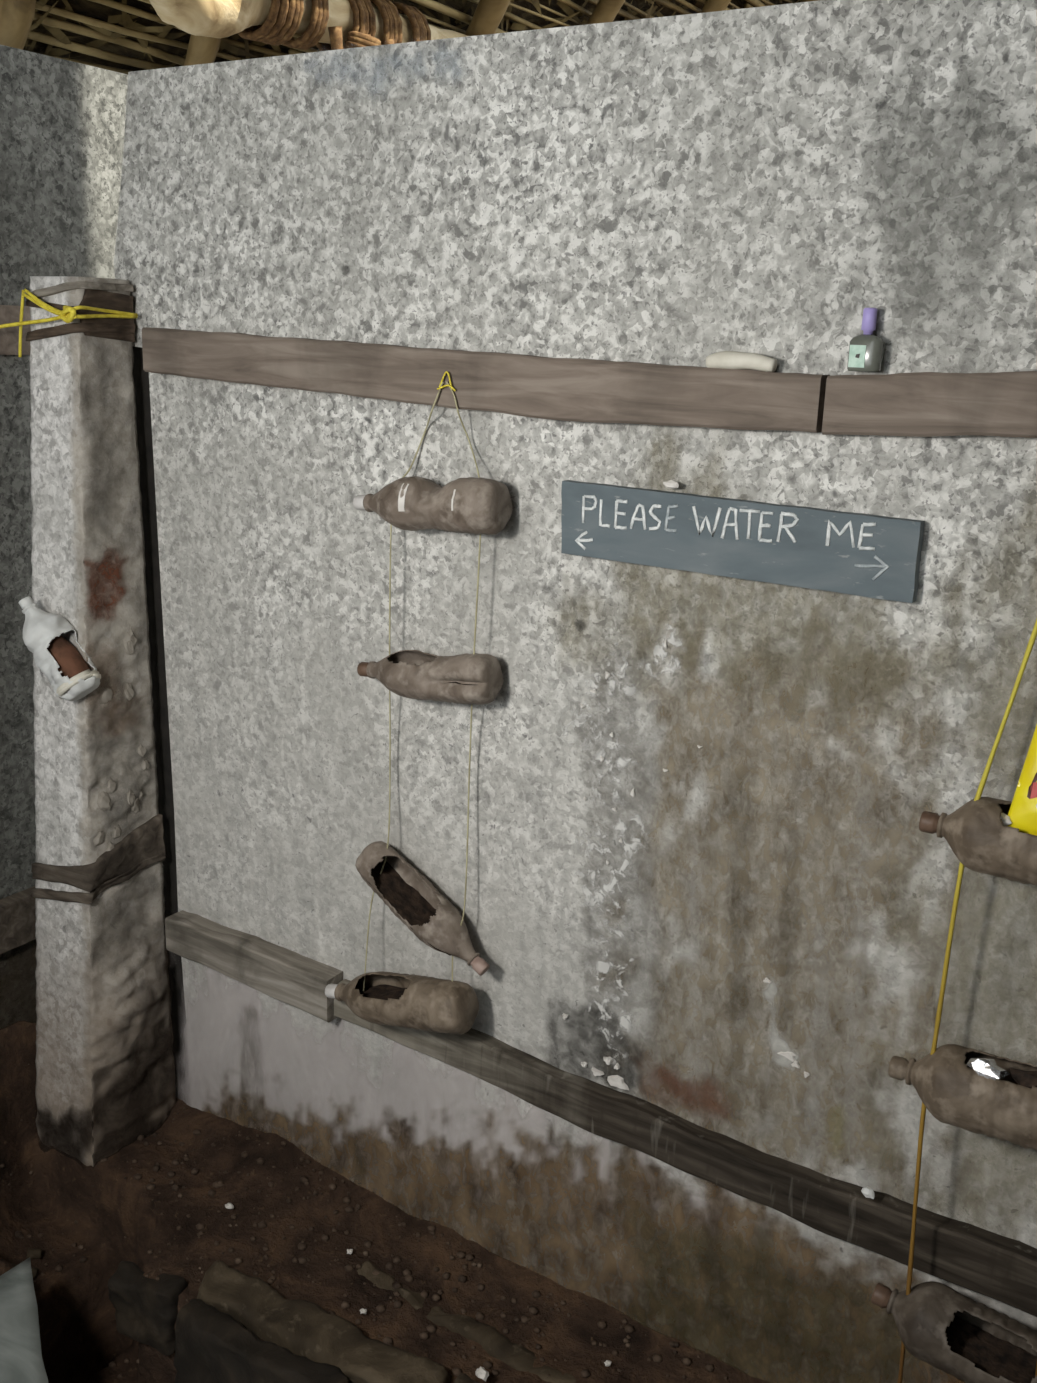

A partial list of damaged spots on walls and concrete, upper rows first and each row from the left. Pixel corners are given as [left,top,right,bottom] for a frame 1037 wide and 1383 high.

rust [83,553,126,620]
peeling [646,625,682,674]
peeling [563,662,644,1048]
leakage [551,564,1037,1195]
leakage [37,990,174,1167]
leakage [204,1095,960,1383]